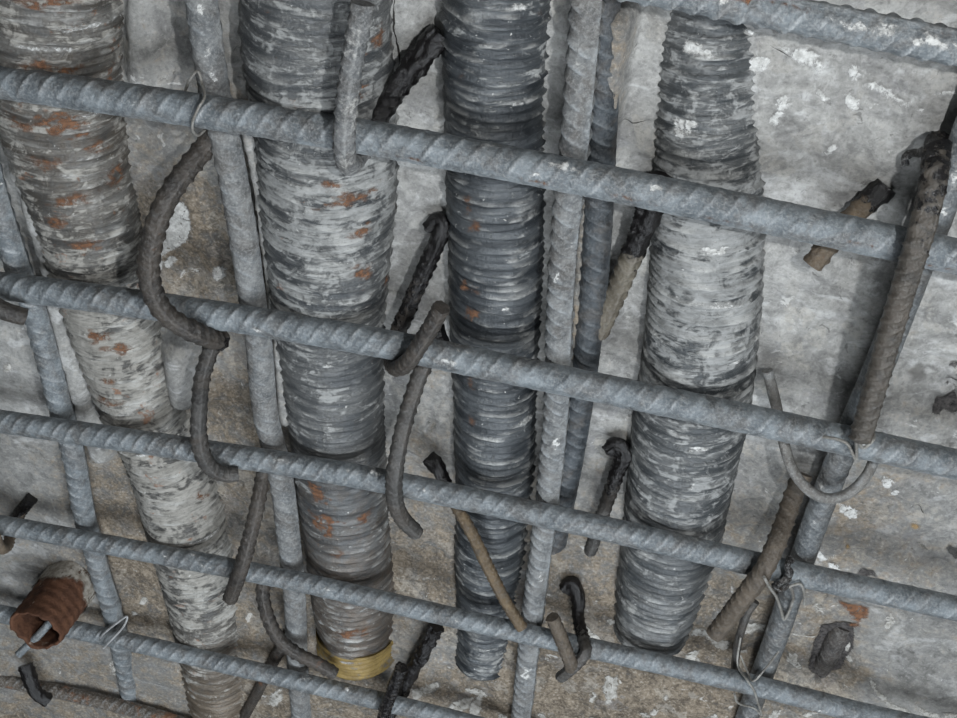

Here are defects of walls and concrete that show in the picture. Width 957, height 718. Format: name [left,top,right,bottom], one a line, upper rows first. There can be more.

corrosion [15,0,71,11]
spalling [0,0,558,718]
spalling [355,0,957,575]
spalling [589,498,957,718]